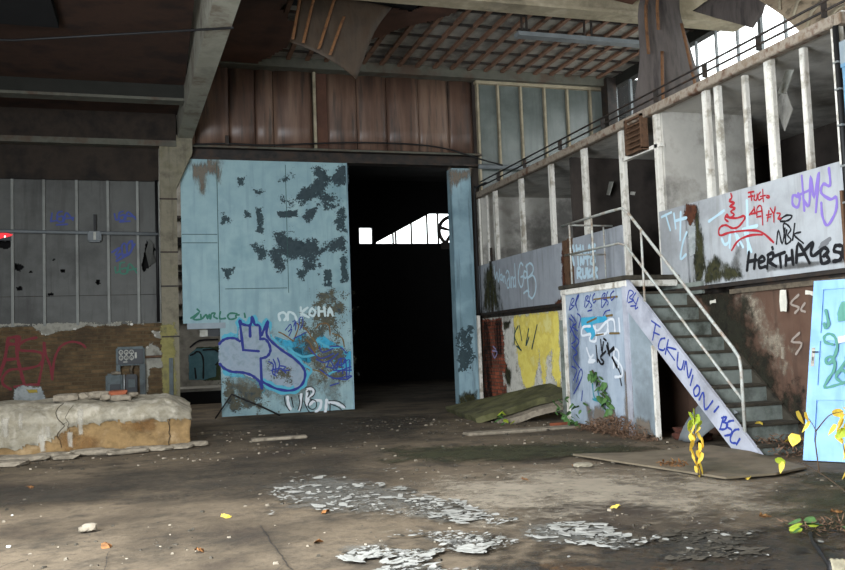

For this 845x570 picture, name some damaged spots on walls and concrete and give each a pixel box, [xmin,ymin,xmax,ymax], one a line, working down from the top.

rust [192,159,221,194]
peeling [243,164,360,387]
leakage [767,262,818,272]
flaking render [0,320,145,336]
peeling [143,322,177,395]
peeling [455,310,563,398]
peeling [13,385,46,401]
peeling [218,359,294,417]